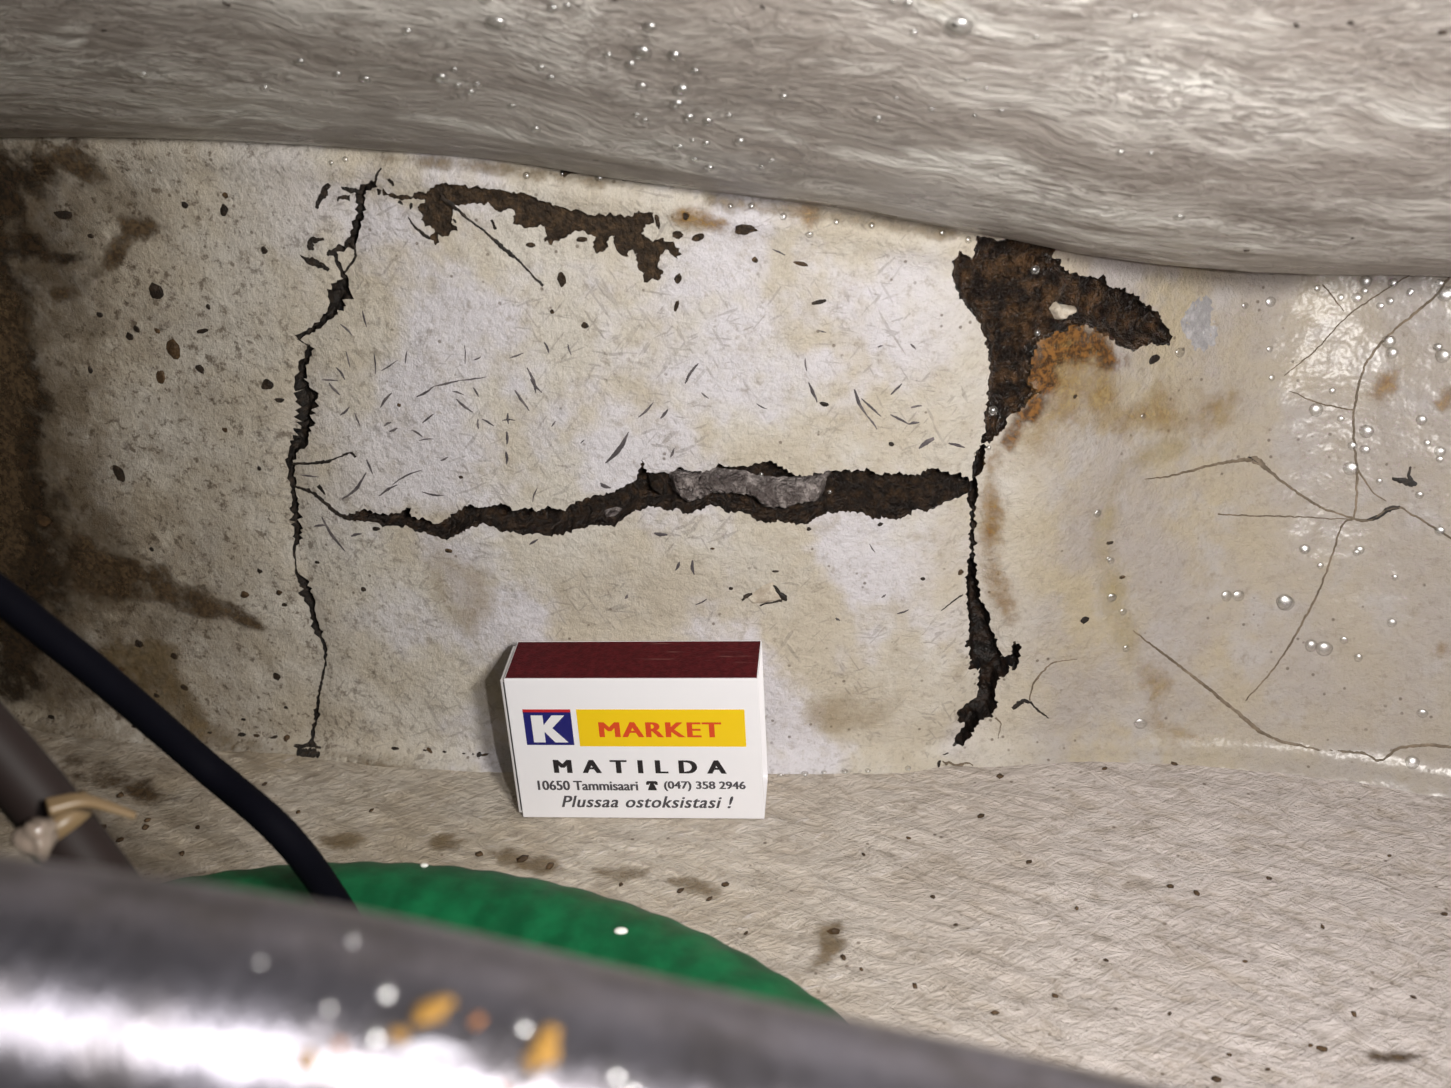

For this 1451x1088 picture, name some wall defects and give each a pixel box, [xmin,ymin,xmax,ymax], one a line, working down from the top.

water stain [54,211,72,219]
water stain [220,192,228,216]
water stain [149,282,164,299]
water stain [126,325,204,384]
water stain [261,379,284,403]
rust [1002,324,1116,449]
water stain [113,465,125,482]
crack [285,168,1077,767]
rust [984,494,1000,537]
crack [1132,275,1451,762]
water stain [237,718,290,742]